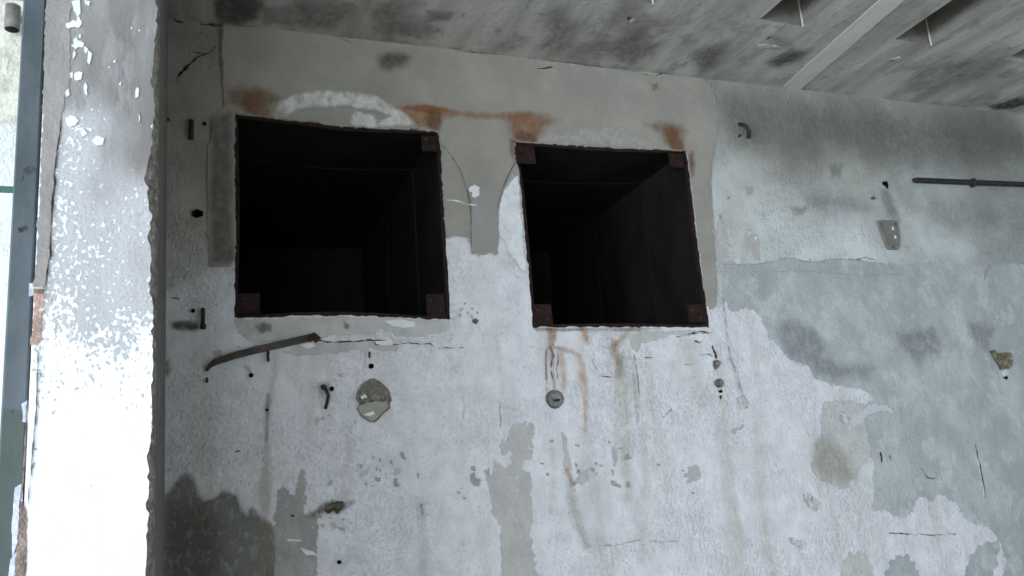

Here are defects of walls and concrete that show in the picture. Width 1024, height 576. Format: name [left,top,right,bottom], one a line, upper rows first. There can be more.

crack [173,18,253,102]
crack [533,58,667,75]
peeling [18,0,105,345]
rust [404,106,453,129]
rust [655,126,682,148]
peeling [715,214,1024,576]
leakage [164,474,275,576]
peeling [470,421,549,576]
peeling [550,432,631,488]